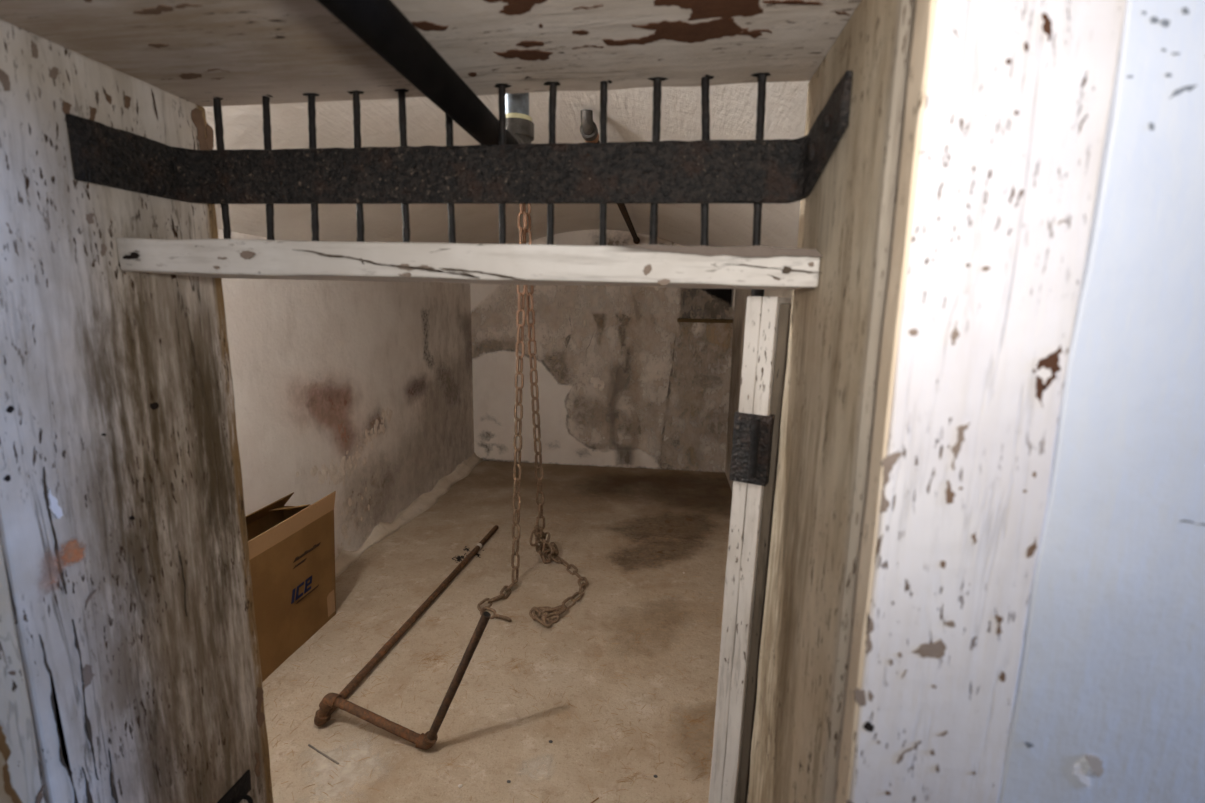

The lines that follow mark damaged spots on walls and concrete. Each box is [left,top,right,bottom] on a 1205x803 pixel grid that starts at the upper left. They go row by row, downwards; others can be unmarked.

peeling [412,21,449,31]
peeling [484,0,547,15]
peeling [493,24,553,61]
peeling [572,0,850,49]
peeling [1042,13,1052,42]
crack [293,249,530,281]
peeling [1033,345,1062,408]
peeling [880,452,903,513]
peeling [946,423,970,504]
damp [616,514,714,569]
peeling [1026,537,1037,558]
peeling [889,621,955,679]